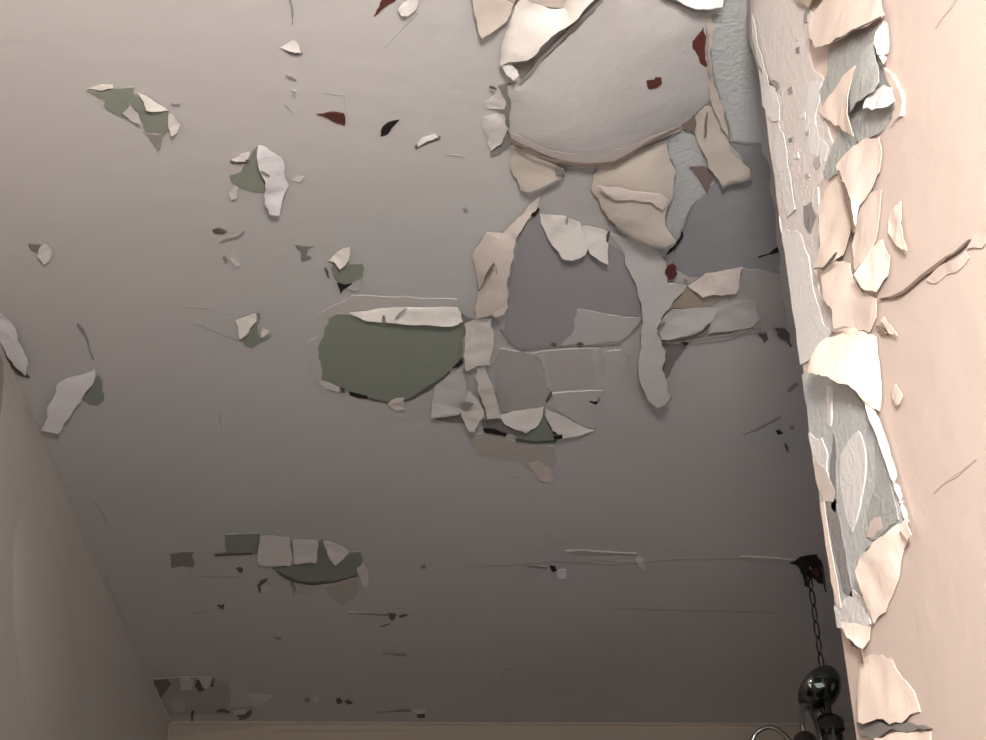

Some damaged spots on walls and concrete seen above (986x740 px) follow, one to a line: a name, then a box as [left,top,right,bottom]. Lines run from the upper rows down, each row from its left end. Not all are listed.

flaking render [86,84,180,136]
peeling [228,145,305,216]
peeling [0,313,30,378]
peeling [41,369,104,434]
flaking render [317,0,933,740]
spalling [169,551,194,568]
flaking render [225,533,369,593]